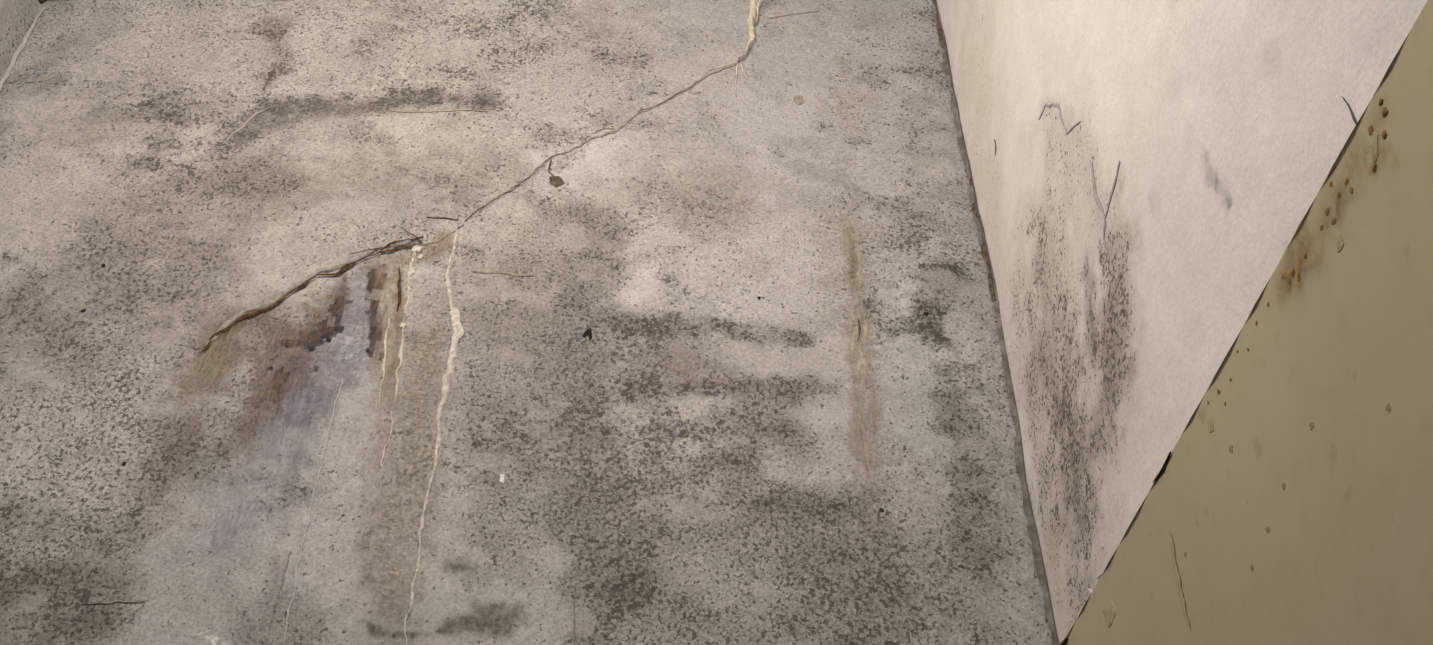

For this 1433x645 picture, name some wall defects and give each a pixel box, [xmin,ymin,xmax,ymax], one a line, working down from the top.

corrosion [376,242,444,394]
crack [472,269,535,277]
crack [465,47,750,221]
corrosion [1320,178,1353,230]
leakage [261,307,370,645]
leakage [357,224,465,645]
leakage [460,604,517,633]